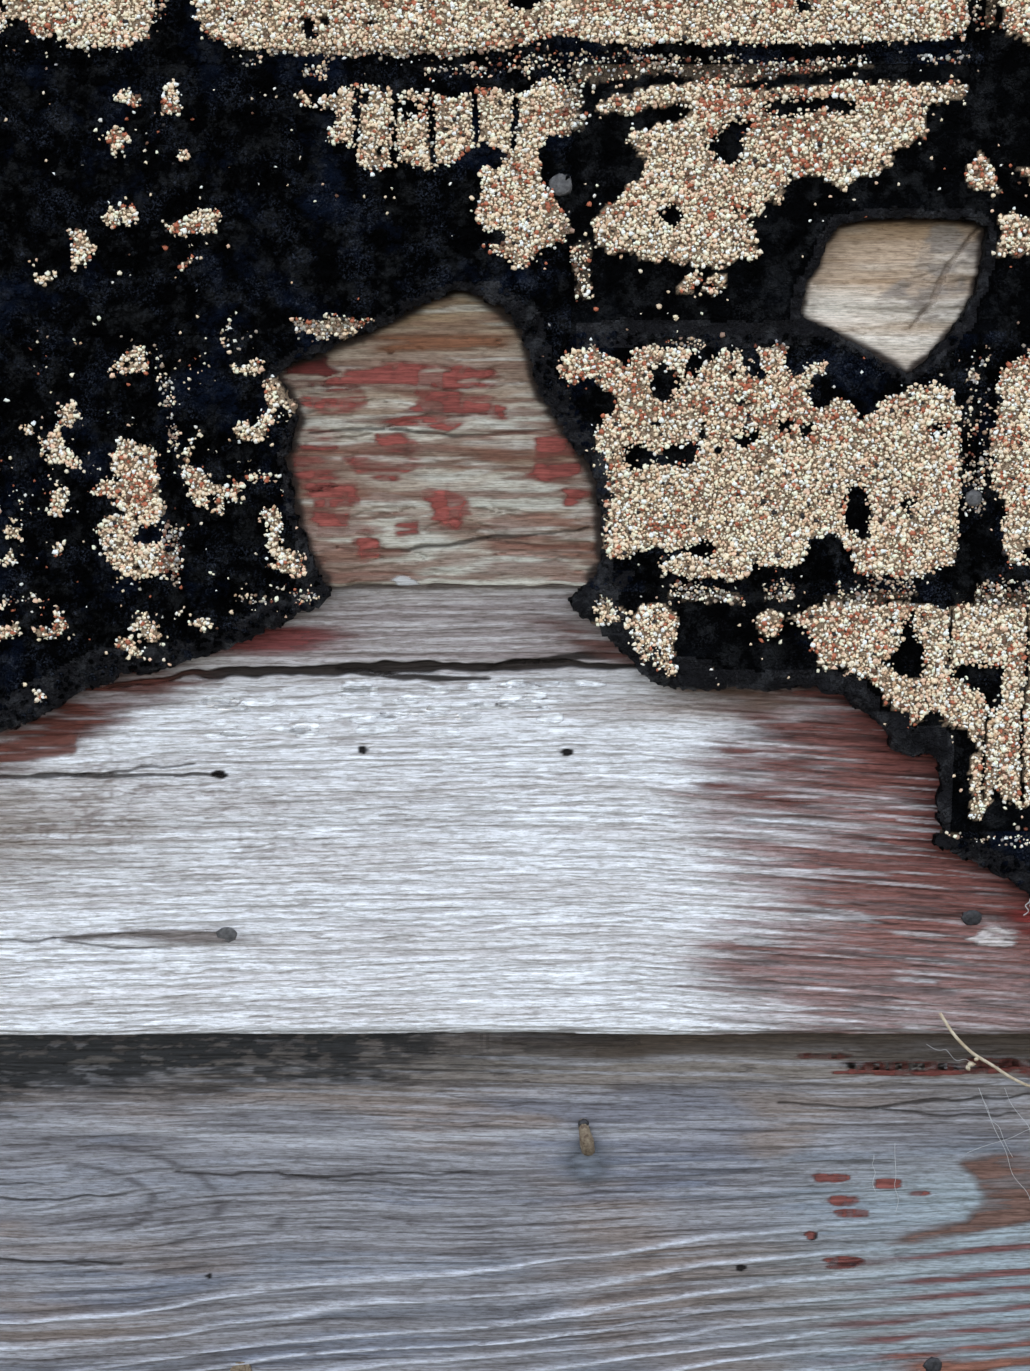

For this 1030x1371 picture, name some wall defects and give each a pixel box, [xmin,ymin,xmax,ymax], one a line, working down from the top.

peeling [0,0,1030,739]
crack [164,652,636,681]
peeling [958,831,1030,886]
peeling [966,927,1016,947]